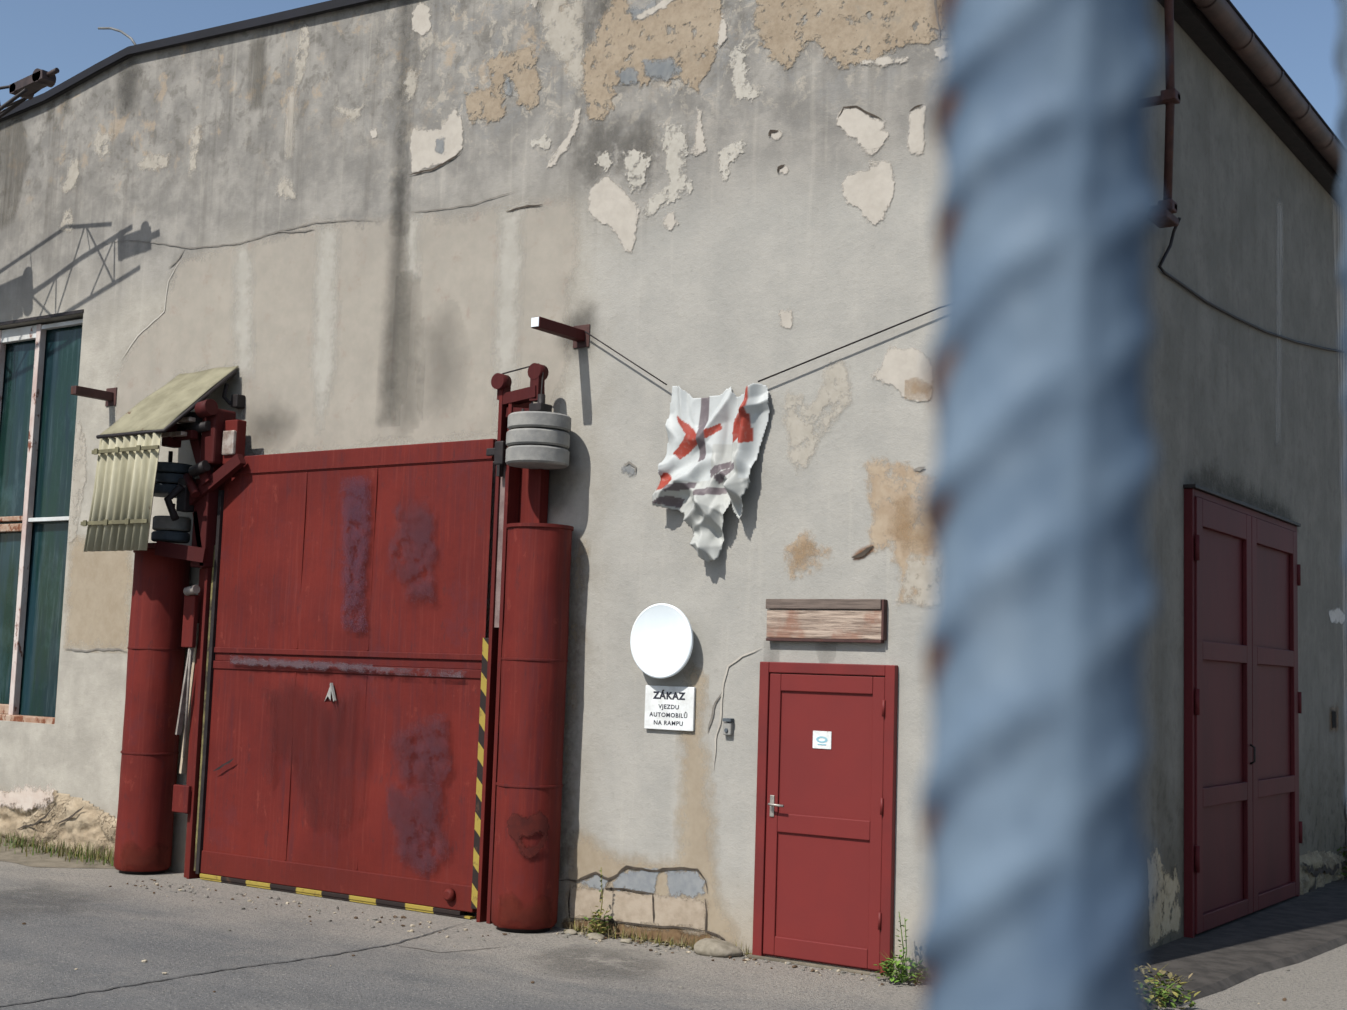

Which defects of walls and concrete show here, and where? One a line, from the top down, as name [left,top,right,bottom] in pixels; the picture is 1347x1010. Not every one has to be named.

flaking render [410,0,944,252]
crack [102,219,373,268]
flaking render [872,346,931,402]
flaking render [852,459,935,606]
flaking render [0,784,117,859]
flaking render [566,668,736,942]
flaking render [1148,848,1181,946]